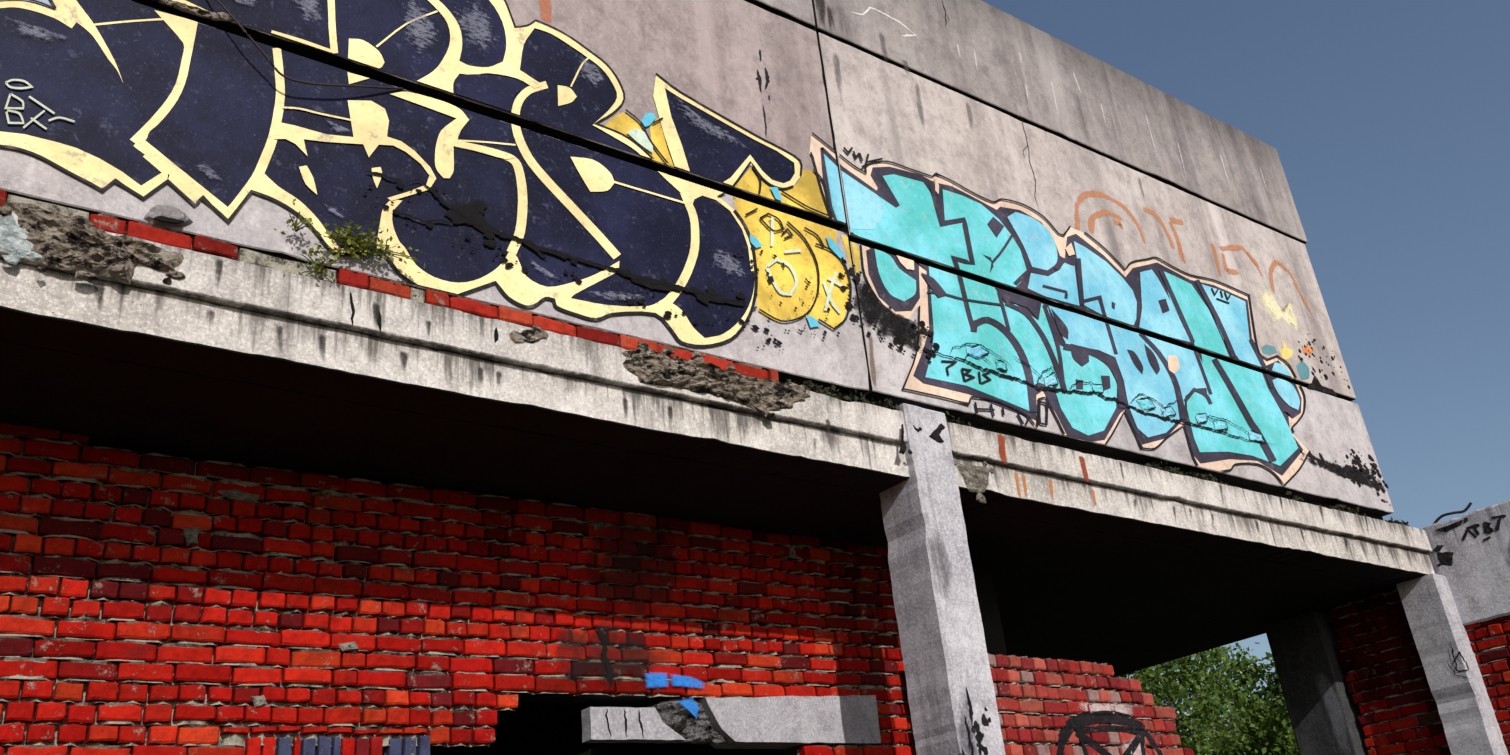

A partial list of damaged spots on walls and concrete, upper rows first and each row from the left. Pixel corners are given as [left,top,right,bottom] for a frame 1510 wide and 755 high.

spalling [0,202,186,285]
spalling [621,342,812,422]
corrosion [998,434,1027,496]
corrosion [1079,456,1096,505]